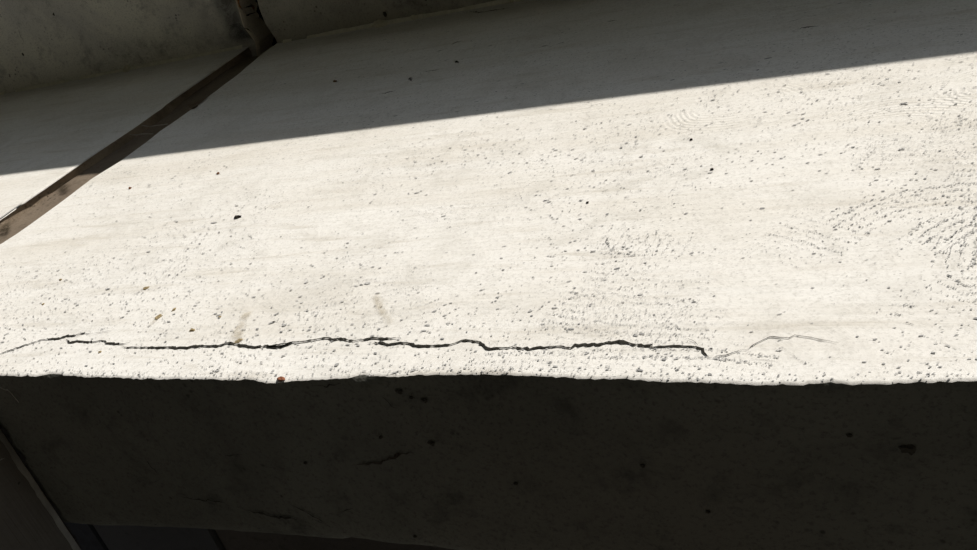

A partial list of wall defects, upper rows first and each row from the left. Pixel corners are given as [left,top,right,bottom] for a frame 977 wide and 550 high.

crack [0,330,819,358]